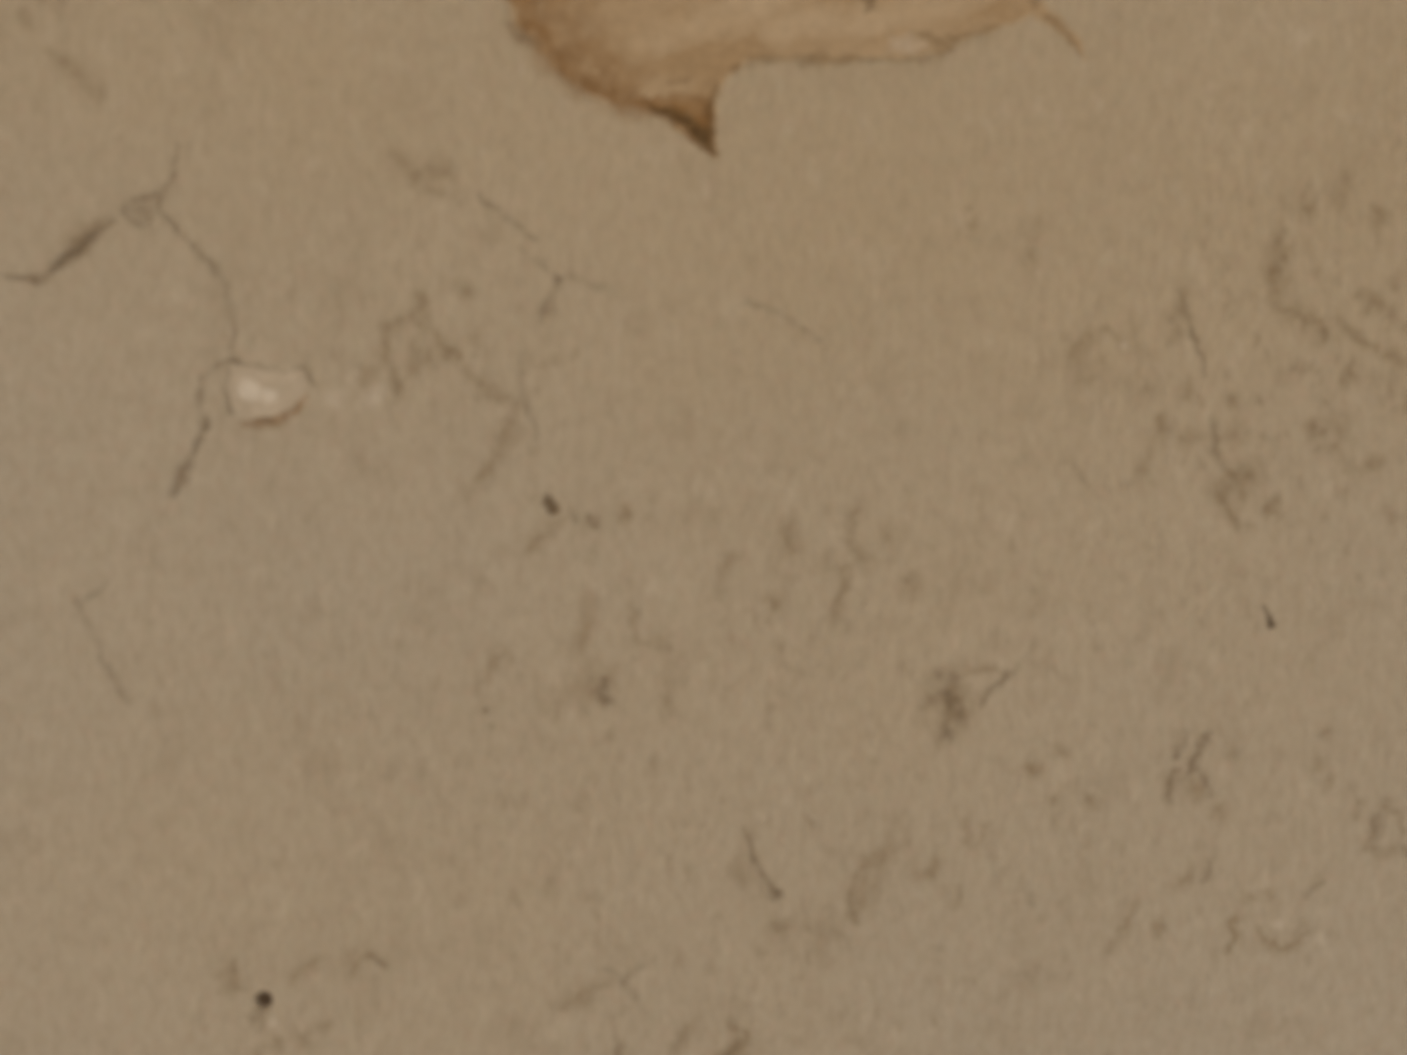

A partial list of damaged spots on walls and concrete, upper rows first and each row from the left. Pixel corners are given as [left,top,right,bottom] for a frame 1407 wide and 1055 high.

spalling [492,0,1089,162]
crack [2,140,242,363]
spalling [167,353,322,501]